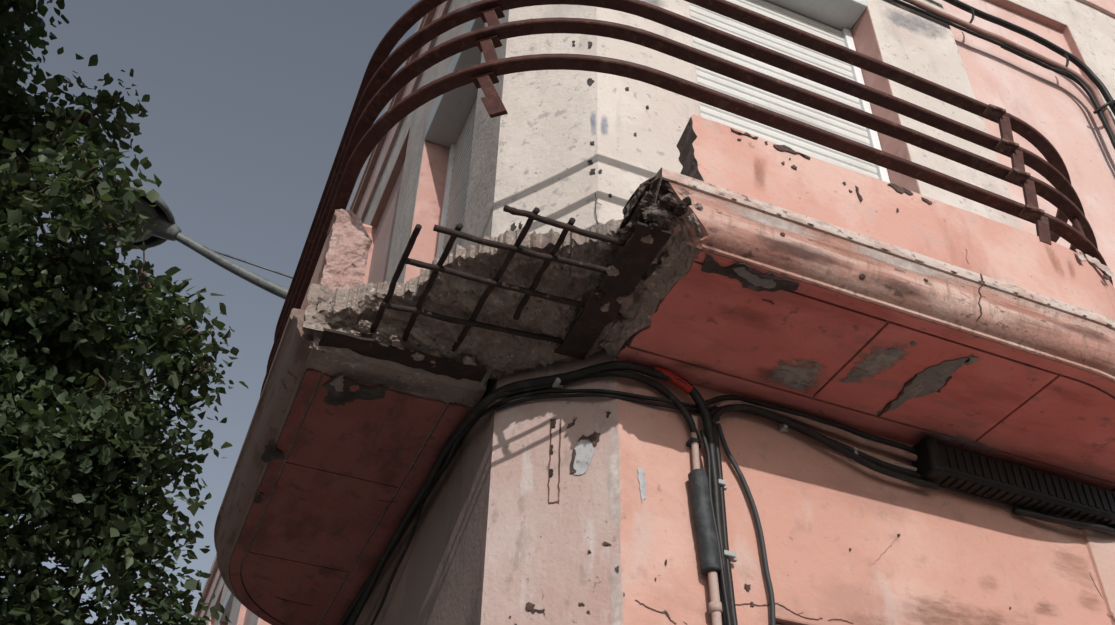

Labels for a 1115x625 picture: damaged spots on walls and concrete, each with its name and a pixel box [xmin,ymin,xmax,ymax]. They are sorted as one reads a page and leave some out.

spalling [303,177,799,406]
crack [966,249,985,321]
peeling [768,360,821,391]
peeling [841,342,916,383]
peeling [877,354,979,417]
peeling [567,416,600,475]
peeling [637,468,646,503]